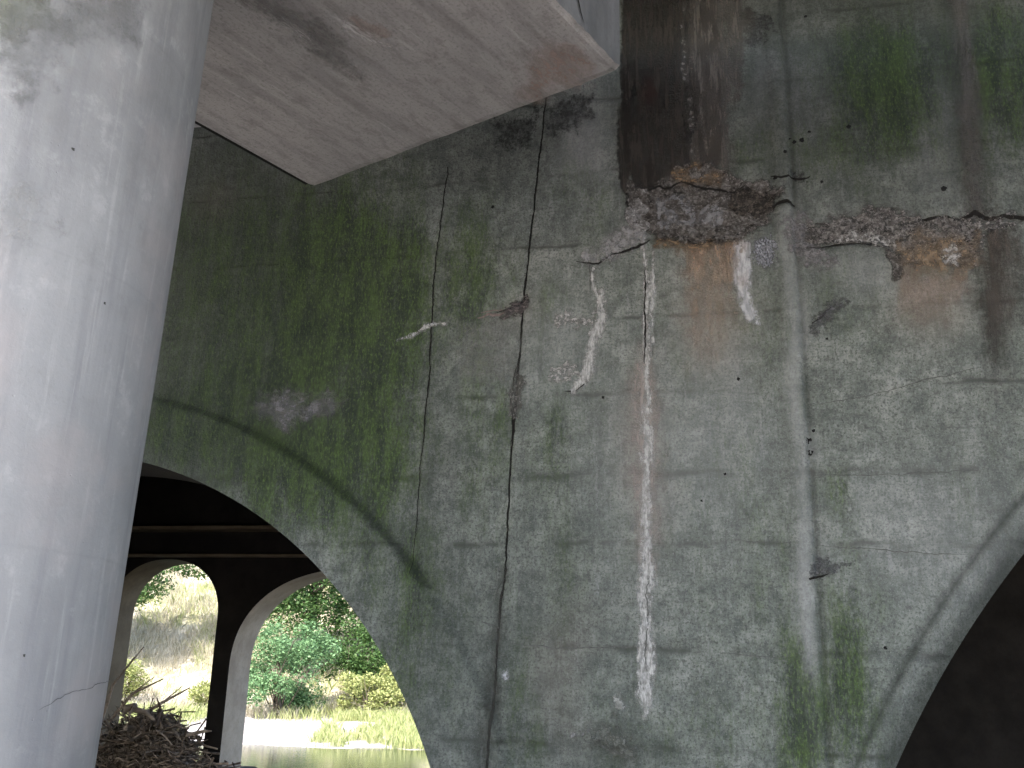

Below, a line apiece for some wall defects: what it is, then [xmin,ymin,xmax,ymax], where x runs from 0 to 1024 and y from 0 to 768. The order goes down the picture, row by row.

damp [491,93,595,151]
damp [617,0,775,207]
crack [409,167,449,573]
spalling [478,294,529,320]
crack [480,97,638,768]
damp [548,264,607,394]
damp [632,230,657,715]
damp [732,242,757,323]
spalling [576,162,1024,281]